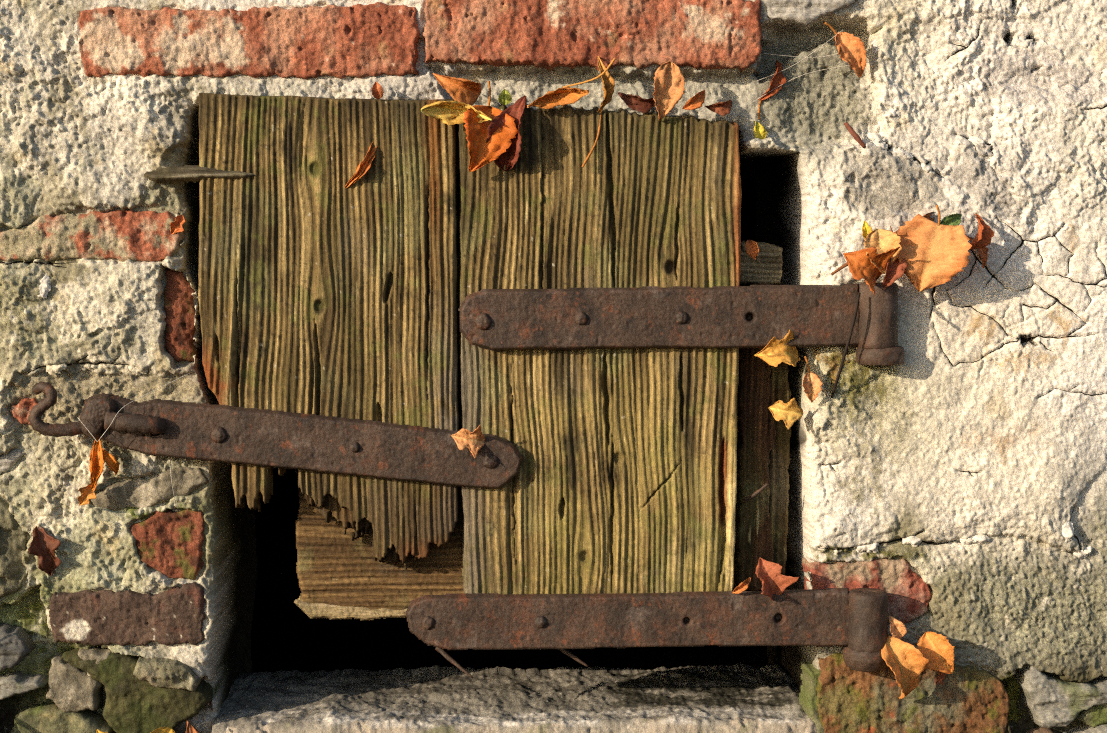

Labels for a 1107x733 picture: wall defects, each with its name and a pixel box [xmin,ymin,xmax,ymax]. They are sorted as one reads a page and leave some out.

spalling [0,267,51,345]
crack [929,217,1107,366]
crack [822,531,960,555]